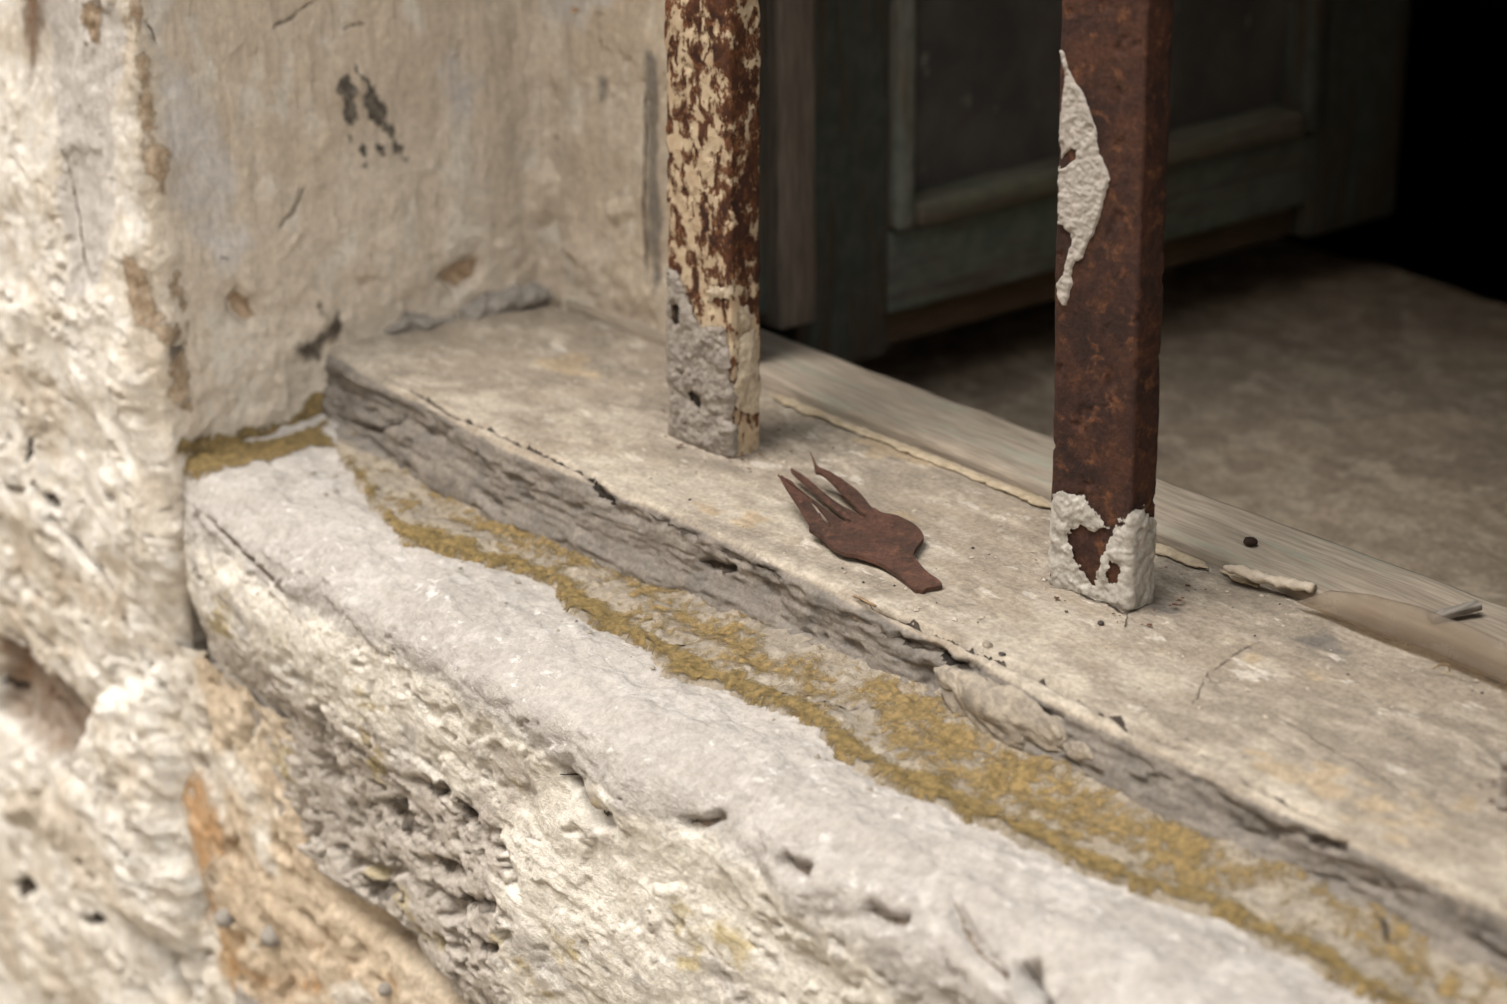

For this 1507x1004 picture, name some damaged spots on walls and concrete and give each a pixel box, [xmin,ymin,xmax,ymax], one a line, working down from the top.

damp [336,66,408,167]
peeling [1056,50,1110,306]